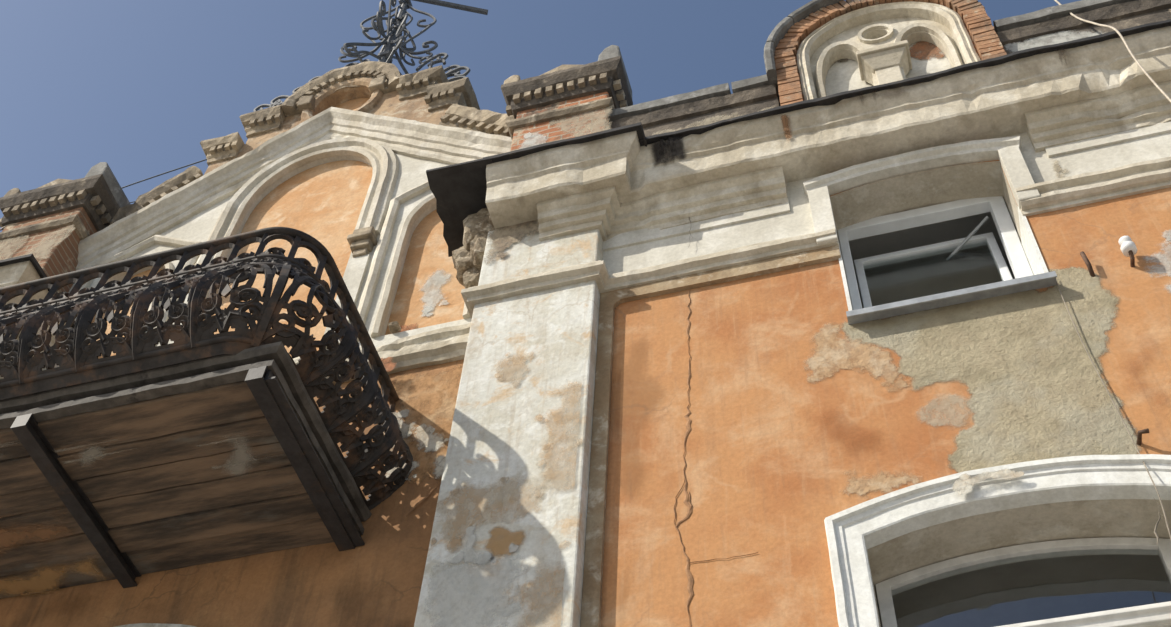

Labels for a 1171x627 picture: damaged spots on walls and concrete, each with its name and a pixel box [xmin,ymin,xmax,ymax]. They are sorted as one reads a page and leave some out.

peeling [522,105,612,149]
spalling [397,208,539,333]
peeling [1146,230,1171,290]
peeling [381,357,463,482]
peeling [431,382,582,564]
crack [673,291,758,622]
spalling [805,267,1141,499]